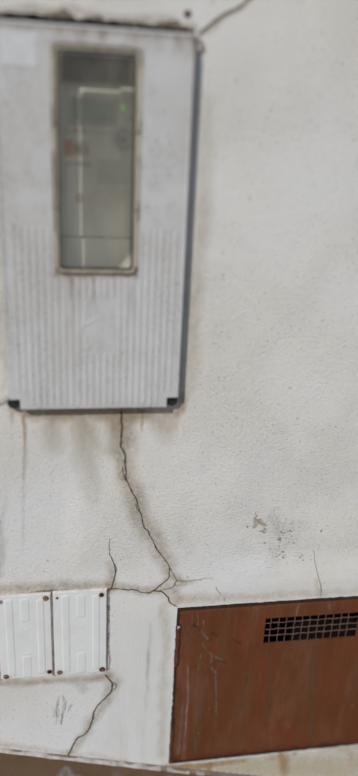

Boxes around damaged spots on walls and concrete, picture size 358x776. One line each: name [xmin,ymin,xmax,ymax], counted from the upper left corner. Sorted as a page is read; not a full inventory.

crack [198,0,248,35]
crack [108,410,225,607]
crack [67,675,117,756]